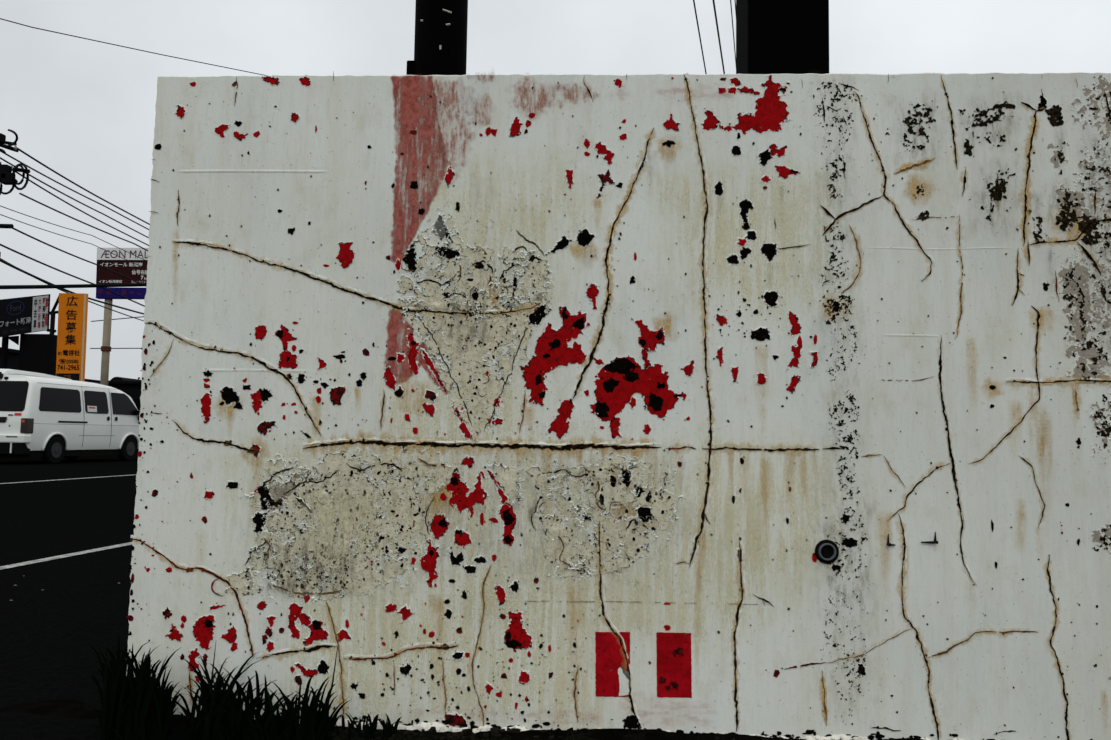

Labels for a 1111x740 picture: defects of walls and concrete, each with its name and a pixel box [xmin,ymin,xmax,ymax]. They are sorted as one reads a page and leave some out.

peeling [162,201,698,688]
crack [130,73,1111,740]
peeling [700,72,804,189]
spalling [726,197,779,267]
peeling [714,289,820,395]
water stain [812,81,858,212]
water stain [818,221,860,381]
water stain [885,101,1016,156]
water stain [969,168,1016,221]
water stain [1026,138,1111,380]
water stain [819,391,870,722]
peeling [484,579,534,710]